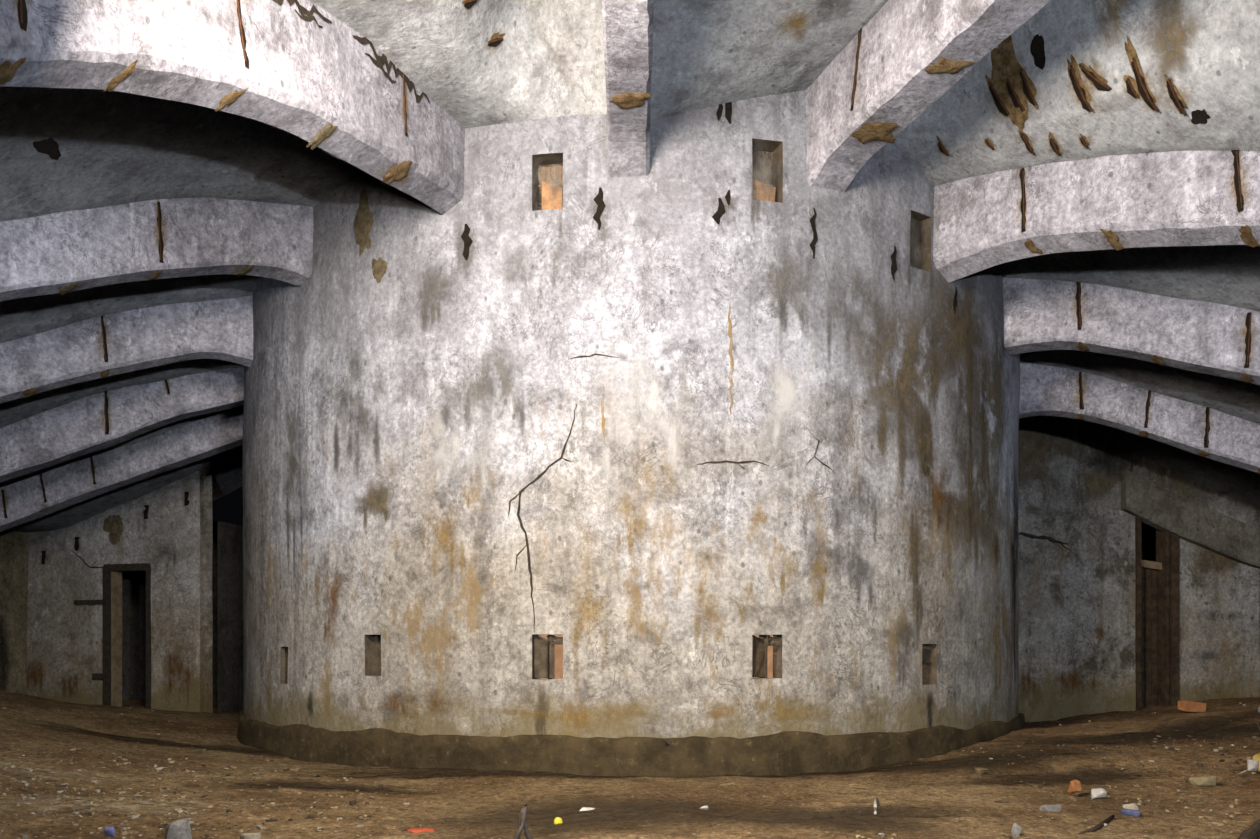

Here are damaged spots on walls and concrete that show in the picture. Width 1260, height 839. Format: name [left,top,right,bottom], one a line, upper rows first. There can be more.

rust [17,0,28,31]
rust [236,0,249,68]
spalling [985,34,1046,156]
spalling [1048,132,1061,157]
spalling [593,187,606,230]
spalling [712,190,733,224]
spalling [810,208,818,258]
rust [1019,168,1043,254]
rust [1231,150,1259,247]
damp [872,272,1018,691]
crack [508,404,577,632]
crack [1018,532,1073,553]